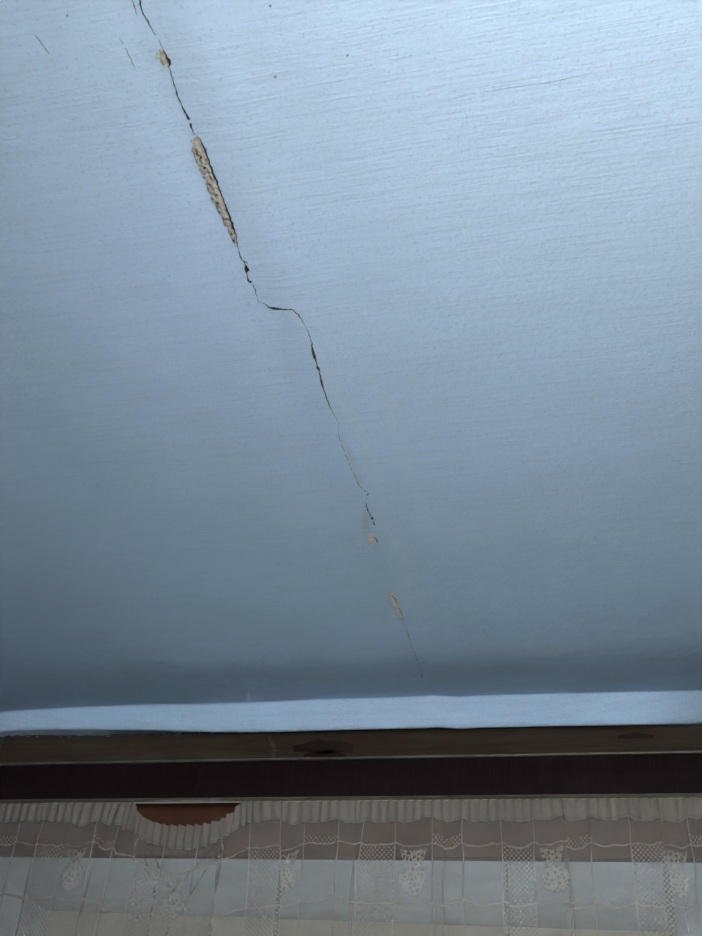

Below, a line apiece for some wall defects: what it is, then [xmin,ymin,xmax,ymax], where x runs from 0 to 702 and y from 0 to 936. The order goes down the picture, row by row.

crack [132,0,195,135]
flaking render [190,135,238,246]
crack [237,247,375,525]